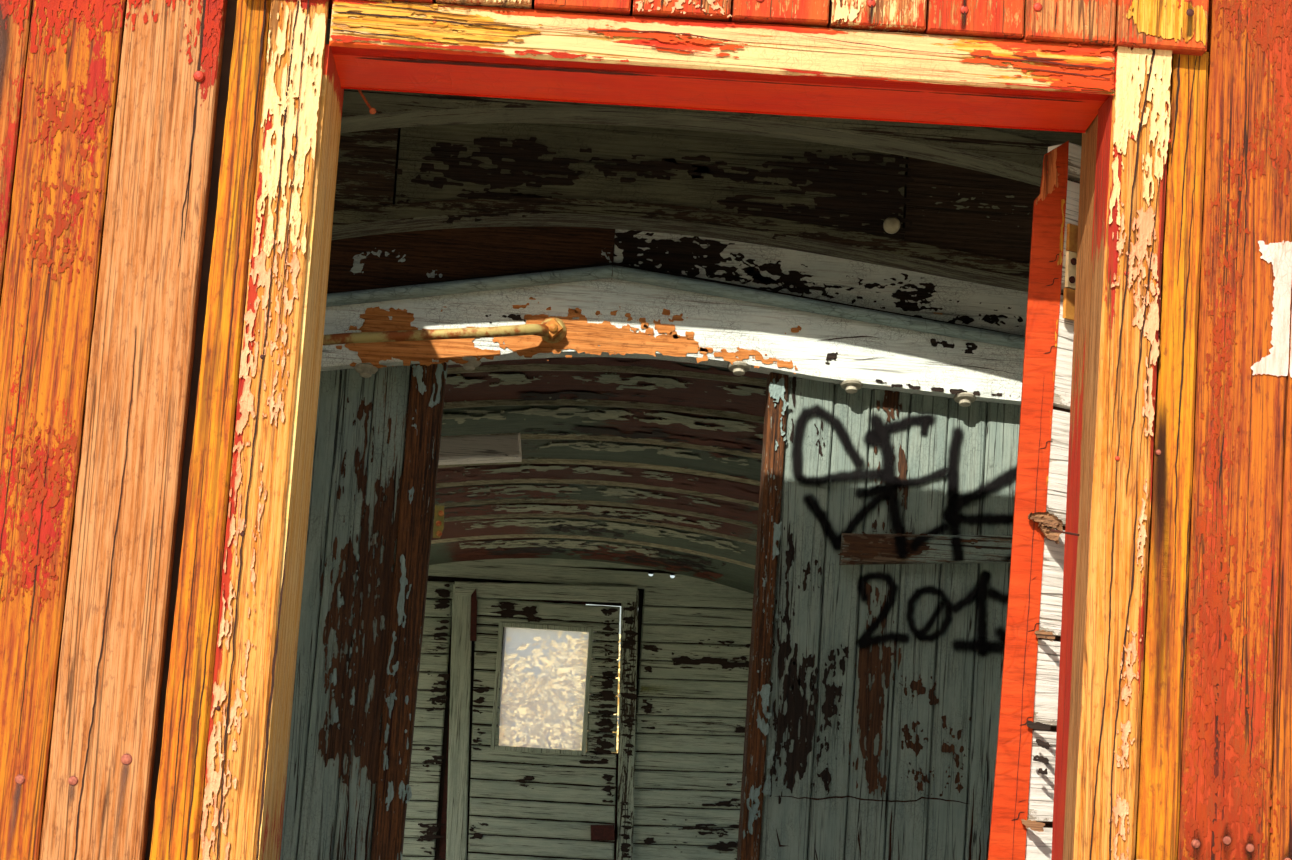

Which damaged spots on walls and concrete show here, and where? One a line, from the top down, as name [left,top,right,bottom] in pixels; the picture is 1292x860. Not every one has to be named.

peeling [0,0,223,68]
peeling [832,0,863,22]
peeling [11,73,114,283]
peeling [387,137,924,240]
peeling [601,219,1023,327]
peeling [200,0,629,860]
peeling [875,379,1020,423]
peeling [0,413,77,612]
peeling [311,297,978,860]